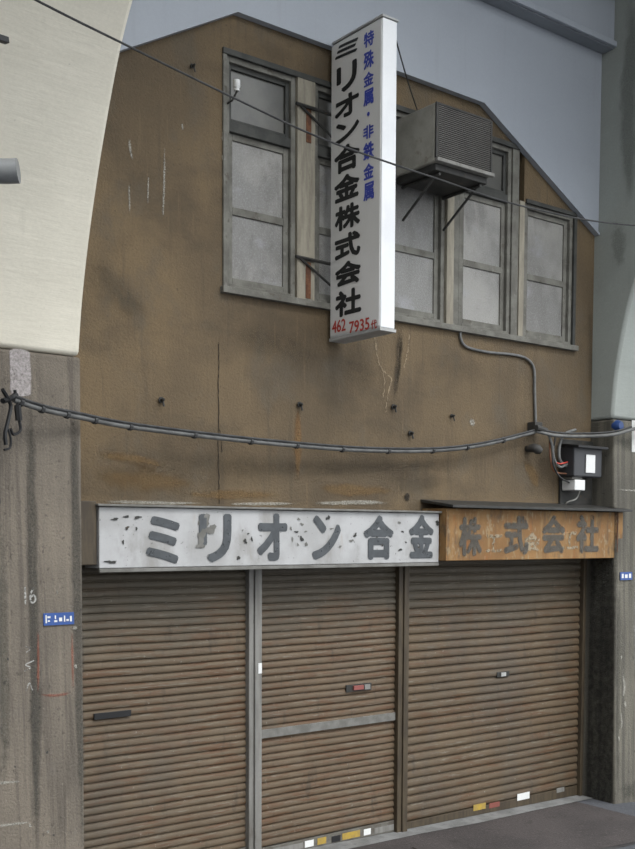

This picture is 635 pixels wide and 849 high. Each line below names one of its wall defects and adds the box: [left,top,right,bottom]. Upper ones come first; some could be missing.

crack [215,342,223,503]
crack [374,335,410,408]
damp [28,441,40,804]